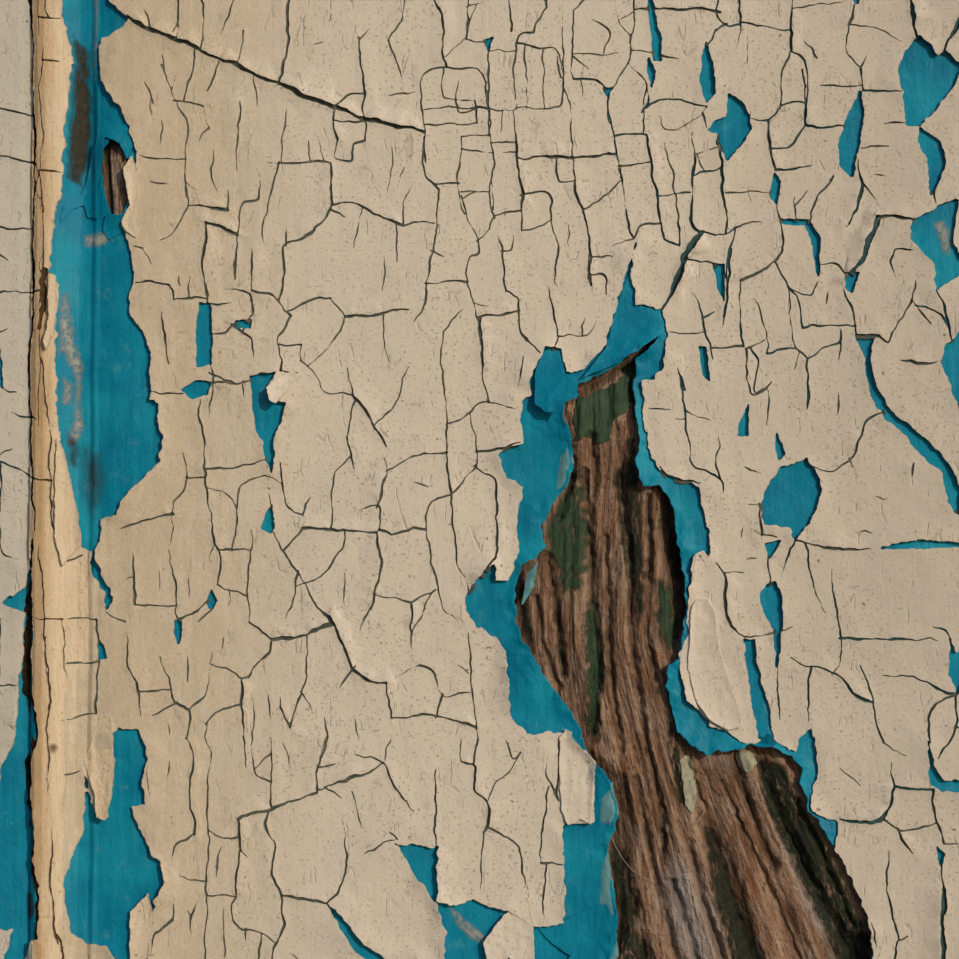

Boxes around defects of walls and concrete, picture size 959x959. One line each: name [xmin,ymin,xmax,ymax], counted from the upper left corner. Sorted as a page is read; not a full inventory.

peeling [43,0,163,610]
crack [670,207,955,425]
crack [821,2,902,93]
crack [848,160,878,224]
peeling [898,36,959,195]
crack [0,0,125,959]
peeling [465,243,876,959]
crack [812,410,886,475]
peeling [0,662,37,959]
peeling [64,716,164,959]
peeling [395,843,509,959]
crack [716,503,959,959]